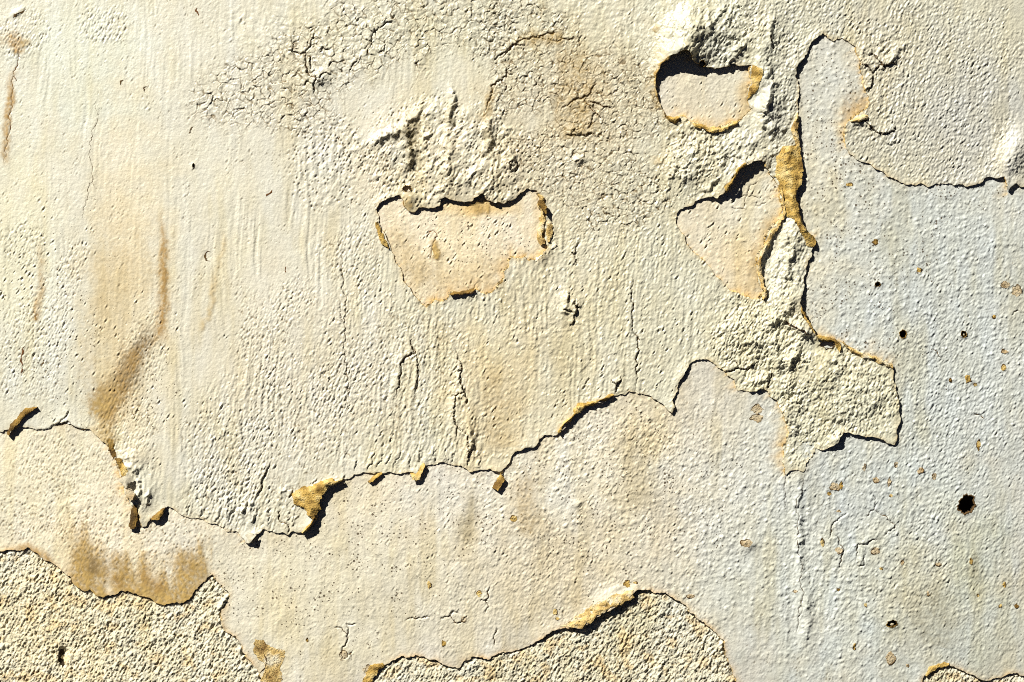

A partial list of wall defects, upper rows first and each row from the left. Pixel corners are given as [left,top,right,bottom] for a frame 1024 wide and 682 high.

crack [189,0,668,226]
peeling [653,50,763,133]
peeling [375,185,557,308]
peeling [676,160,786,300]
crack [453,355,472,466]
spalling [958,495,974,513]
spalling [0,547,261,682]
damp [71,540,206,605]
peeling [253,639,285,682]
spalling [362,590,736,682]
spalling [922,662,1024,682]